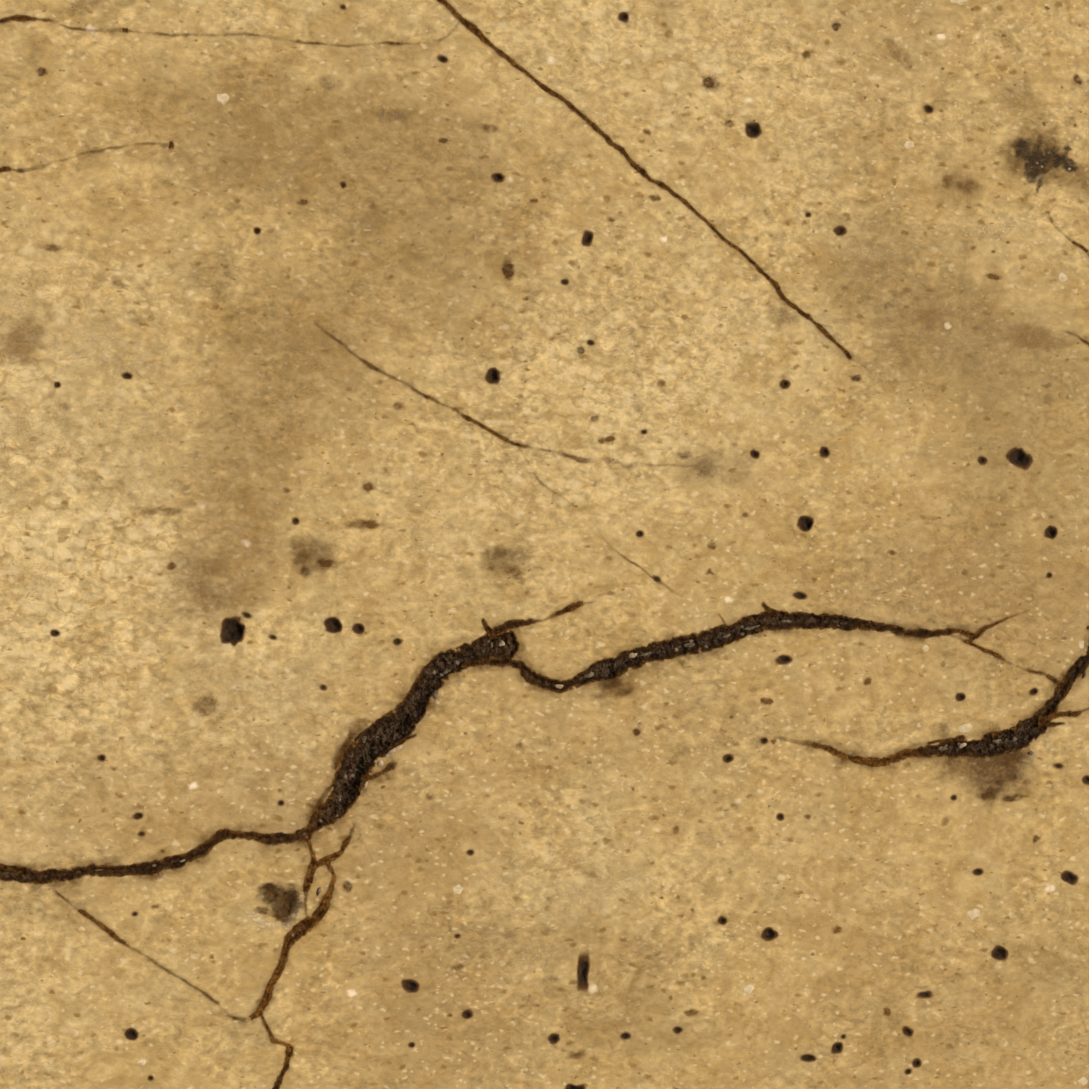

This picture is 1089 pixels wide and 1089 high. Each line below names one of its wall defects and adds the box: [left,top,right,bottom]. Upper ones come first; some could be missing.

crack [0,15,82,30]
crack [437,0,851,359]
crack [458,411,526,447]
crack [805,626,1089,767]
crack [0,602,1006,1089]